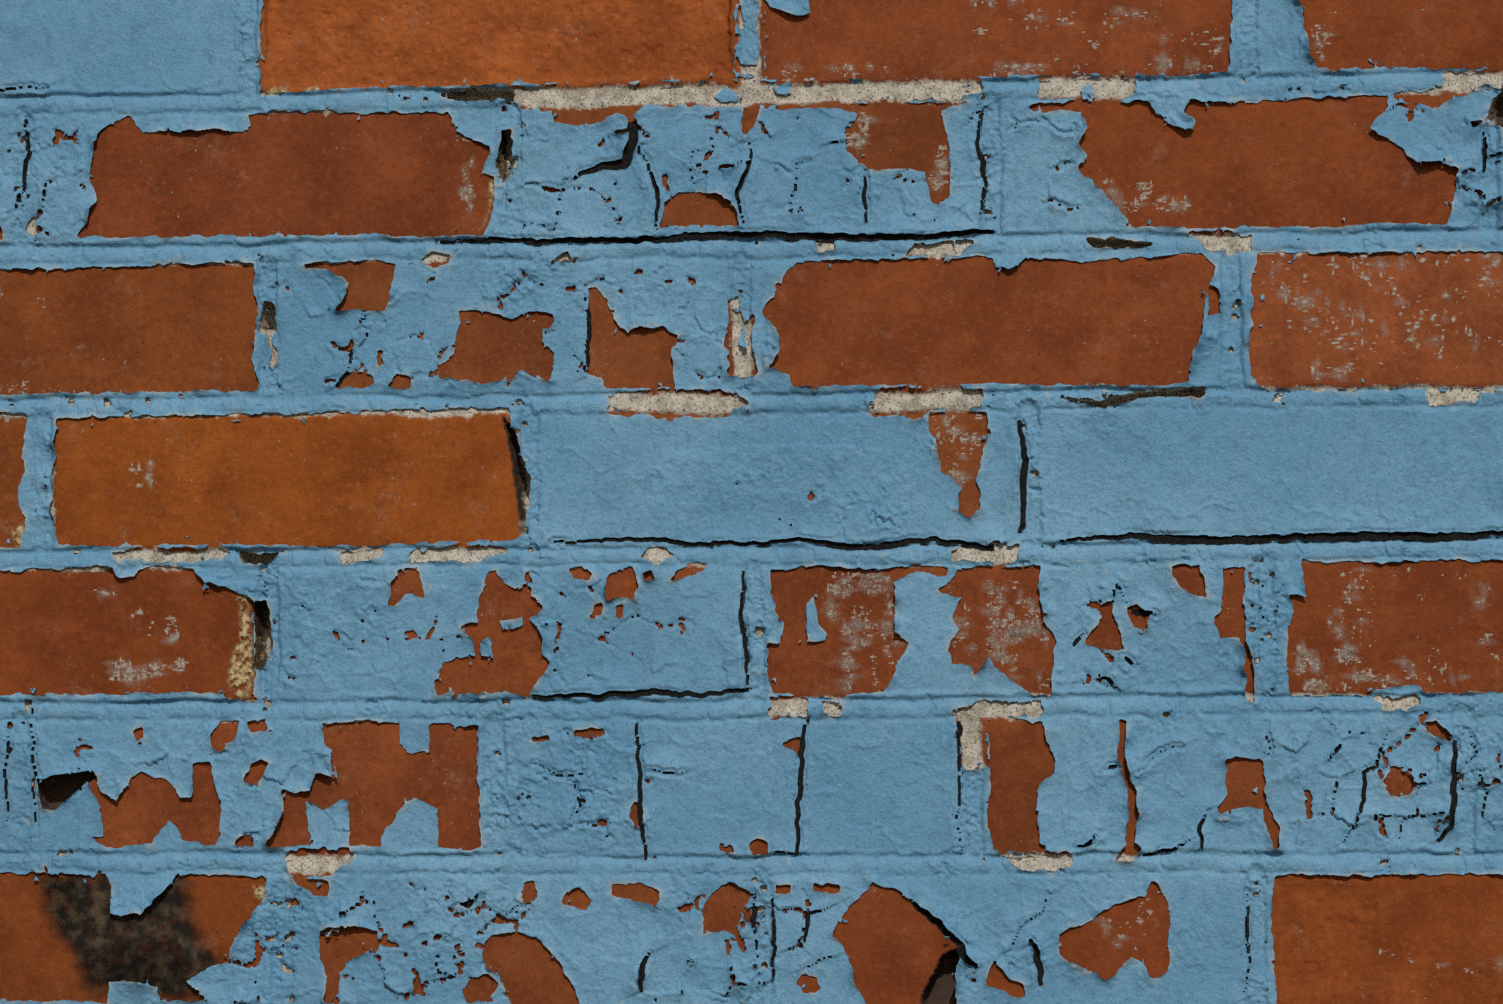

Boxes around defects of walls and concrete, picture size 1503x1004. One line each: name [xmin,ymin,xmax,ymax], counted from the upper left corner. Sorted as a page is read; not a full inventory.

peeling [246,0,1503,531]
peeling [0,99,560,905]
peeling [562,542,720,629]
peeling [1077,592,1161,662]
peeling [522,718,617,755]
peeling [757,532,1086,885]
peeling [0,859,276,1004]
peeling [308,916,392,1004]
peeling [448,869,672,1004]
peeling [619,788,656,835]
peeling [691,826,1033,1004]
peeling [1046,707,1183,992]